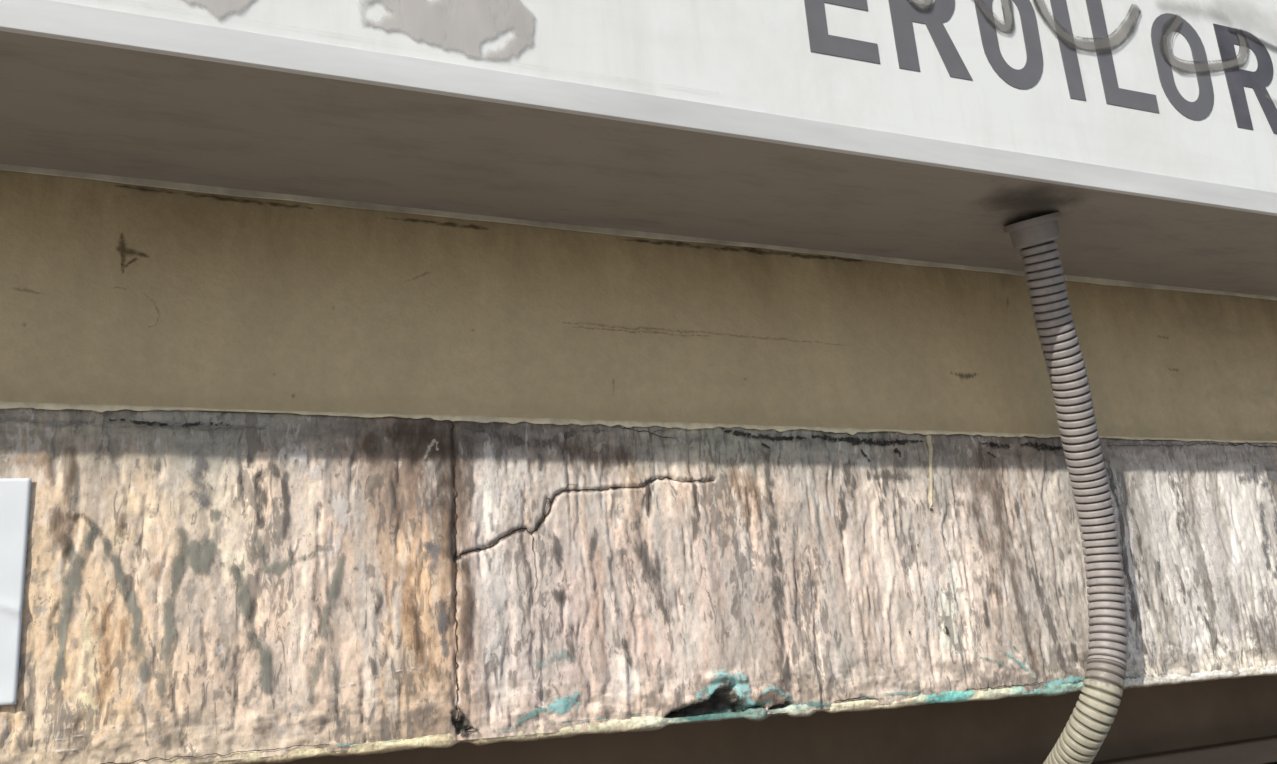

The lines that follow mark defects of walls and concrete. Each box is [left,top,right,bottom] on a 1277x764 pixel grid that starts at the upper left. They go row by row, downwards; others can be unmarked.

crack [615,426,676,439]
water stain [255,444,357,555]
water stain [390,421,474,657]
crack [455,477,713,606]
water stain [627,541,673,623]
water stain [691,482,701,540]
water stain [764,452,789,691]
water stain [837,459,910,538]
water stain [972,449,1078,673]
water stain [1103,457,1239,653]
water stain [1239,468,1277,578]
spalling [665,669,830,718]